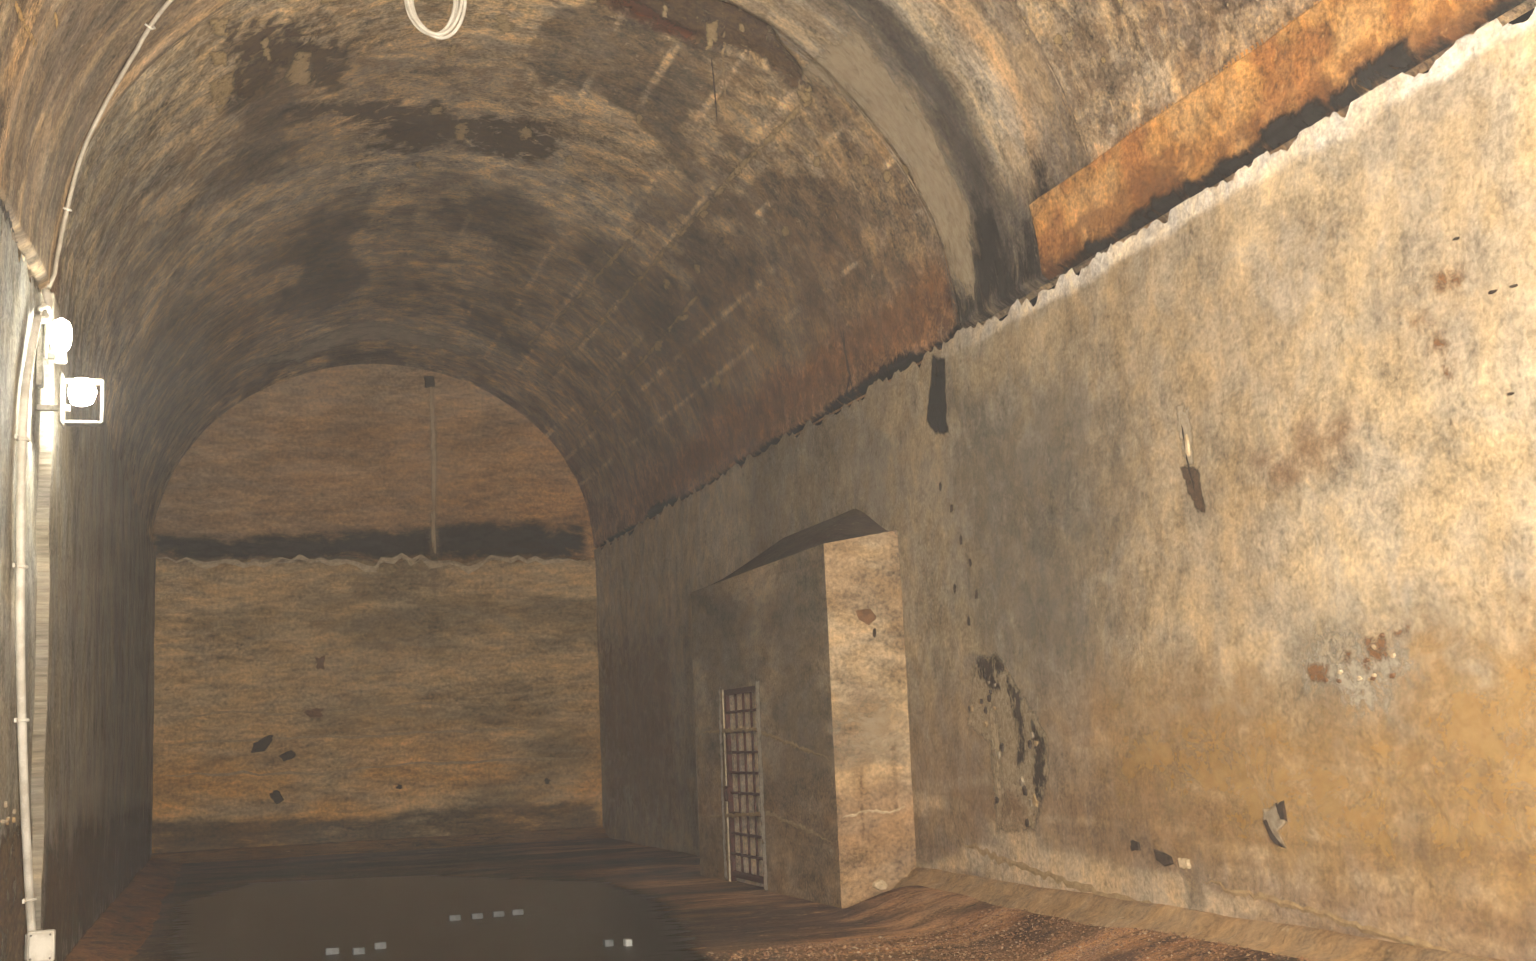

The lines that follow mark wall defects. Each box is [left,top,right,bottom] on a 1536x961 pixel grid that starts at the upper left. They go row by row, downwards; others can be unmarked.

damp [152,0,1526,561]
peeling [1177,404,1205,512]
spalling [968,655,1049,831]
damp [0,801,597,961]